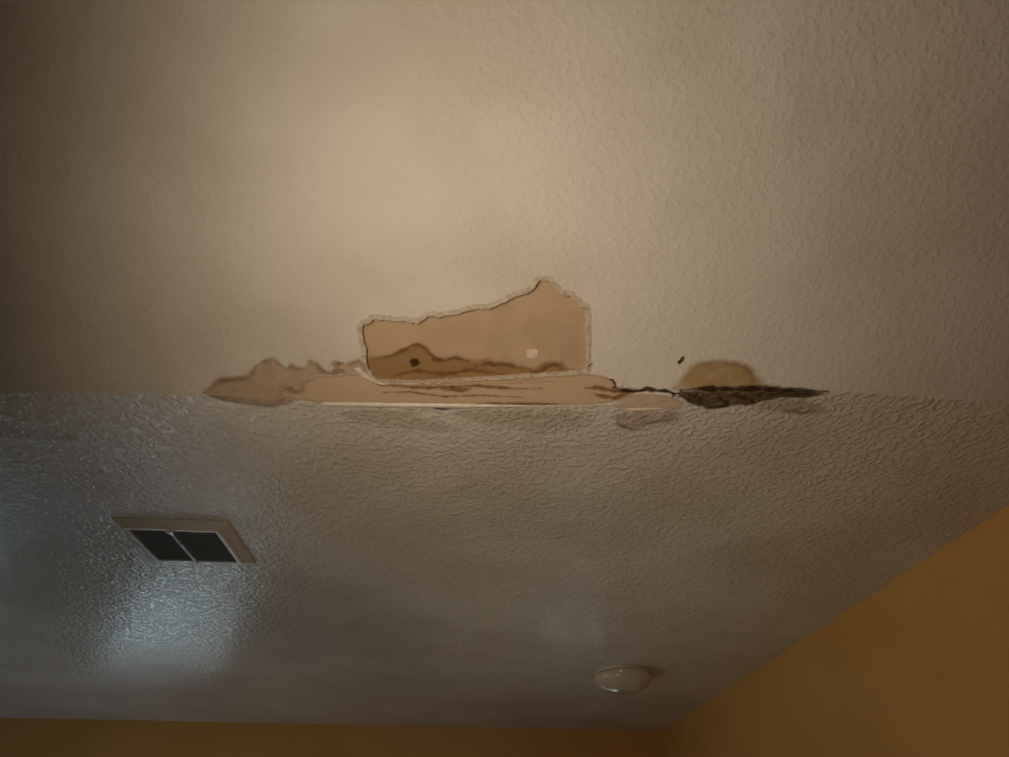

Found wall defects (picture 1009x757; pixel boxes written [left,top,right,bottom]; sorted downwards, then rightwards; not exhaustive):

spalling [280,275,681,415]